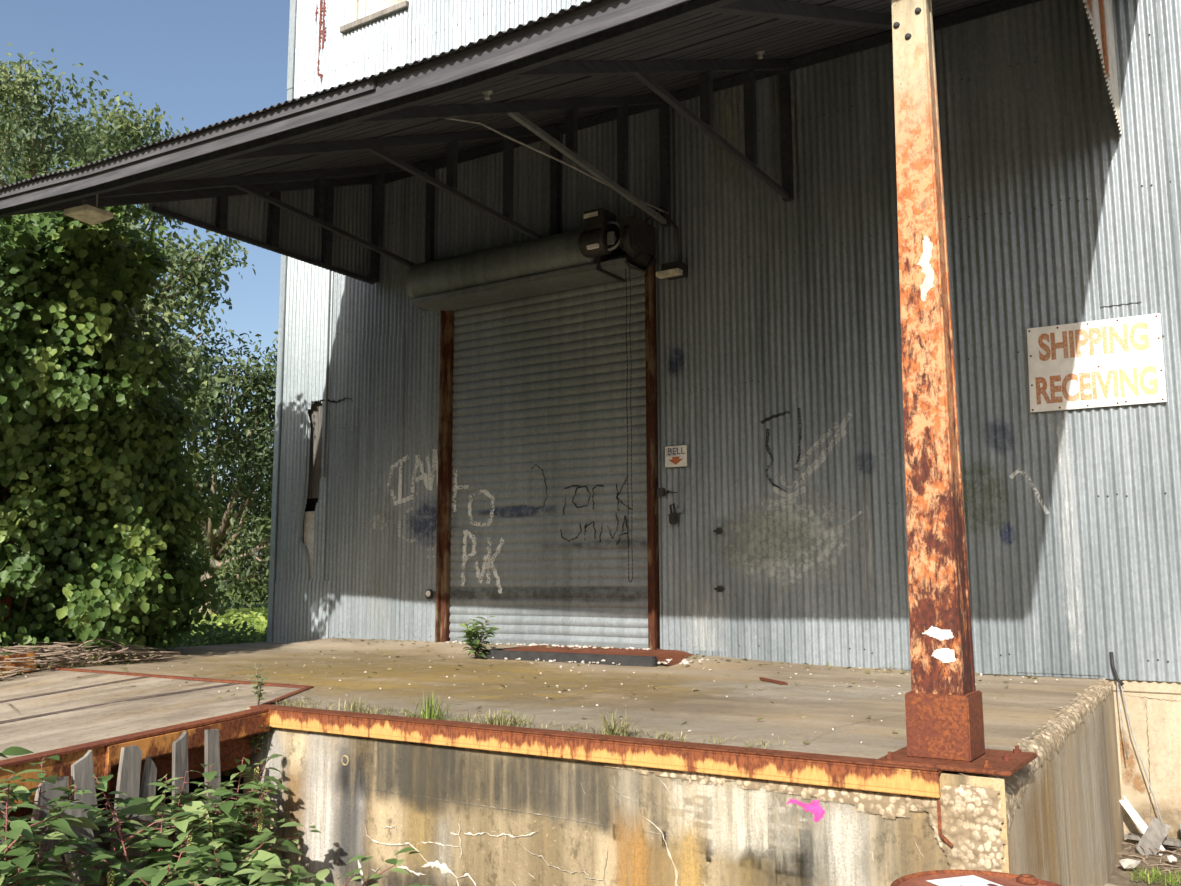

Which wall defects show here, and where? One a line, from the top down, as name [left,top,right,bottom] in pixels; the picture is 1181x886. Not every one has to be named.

corrosion [315,0,326,81]
spalling [303,498,319,543]
corrosion [284,772,310,855]
leakage [303,732,461,886]
crack [365,821,608,886]
leakage [494,757,554,809]
leakage [568,766,634,828]
crack [569,768,706,886]
leakage [672,771,866,886]
spalling [578,679,1113,872]